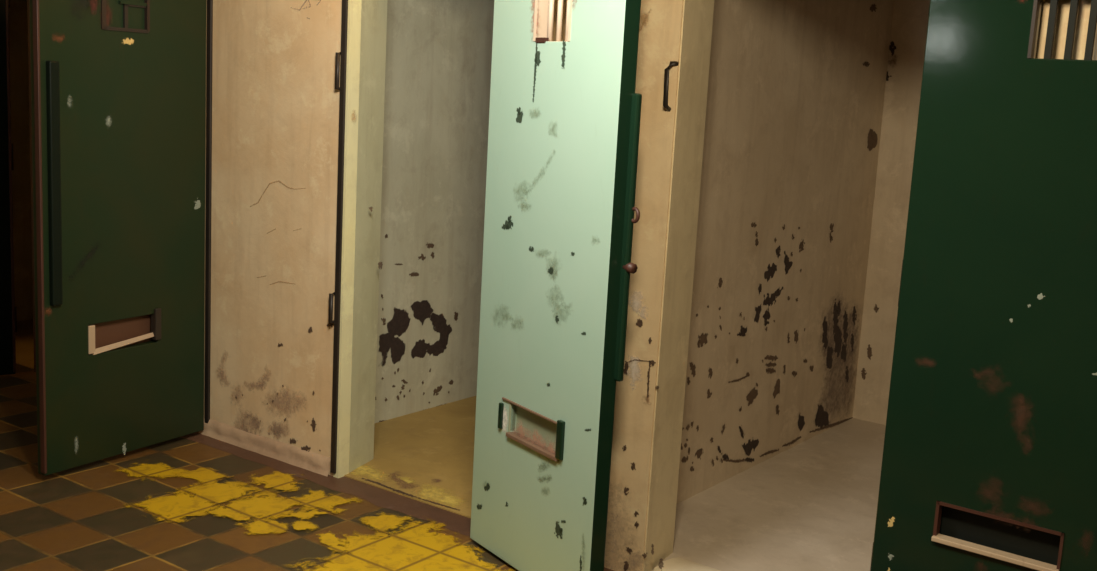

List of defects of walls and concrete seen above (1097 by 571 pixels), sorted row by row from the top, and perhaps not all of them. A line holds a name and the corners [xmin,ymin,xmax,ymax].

crack [250,181,305,207]
peeling [696,224,805,348]
peeling [375,294,458,403]
spalling [736,358,758,411]
spalling [762,355,814,415]
water stain [798,299,857,431]
spalling [679,421,725,471]
water stain [739,425,759,463]
peeling [117,443,514,571]